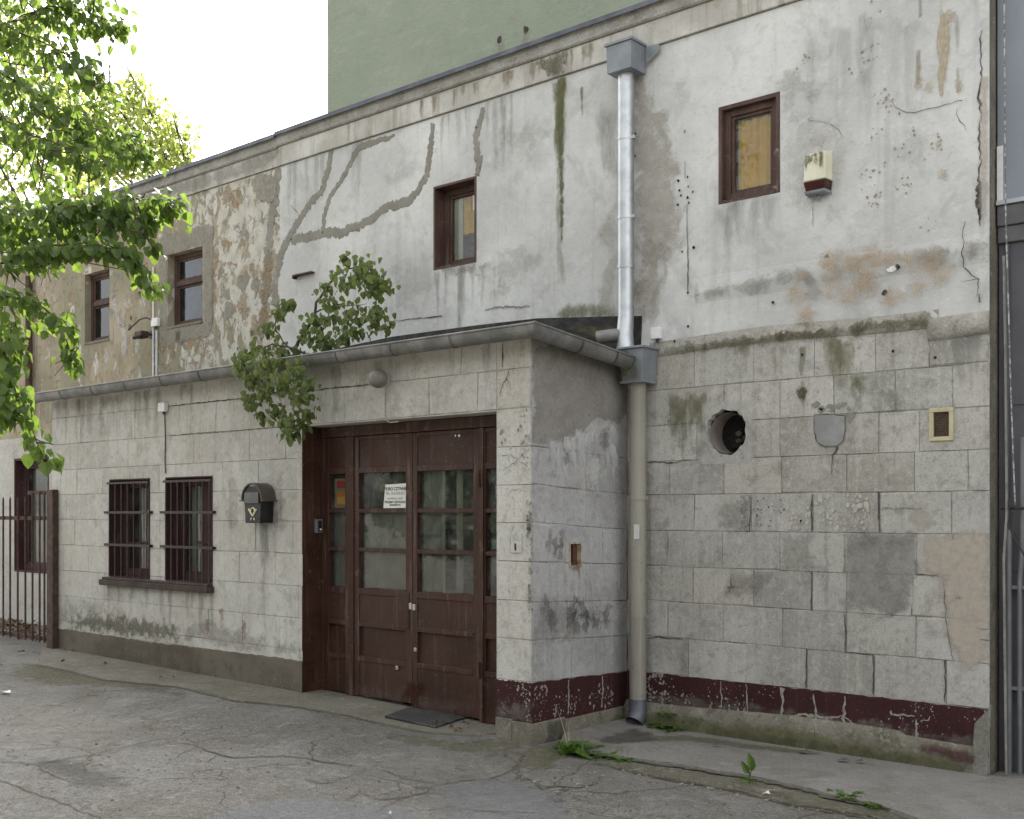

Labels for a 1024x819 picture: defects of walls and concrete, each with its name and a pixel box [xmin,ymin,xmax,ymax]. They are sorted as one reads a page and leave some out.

water stain [554,78,566,240]
crack [891,30,983,303]
flaking render [212,250,273,334]
mould [71,614,174,640]
peeling [502,676,613,722]
peeling [646,672,695,707]
peeling [708,681,863,723]
peeling [880,703,974,764]